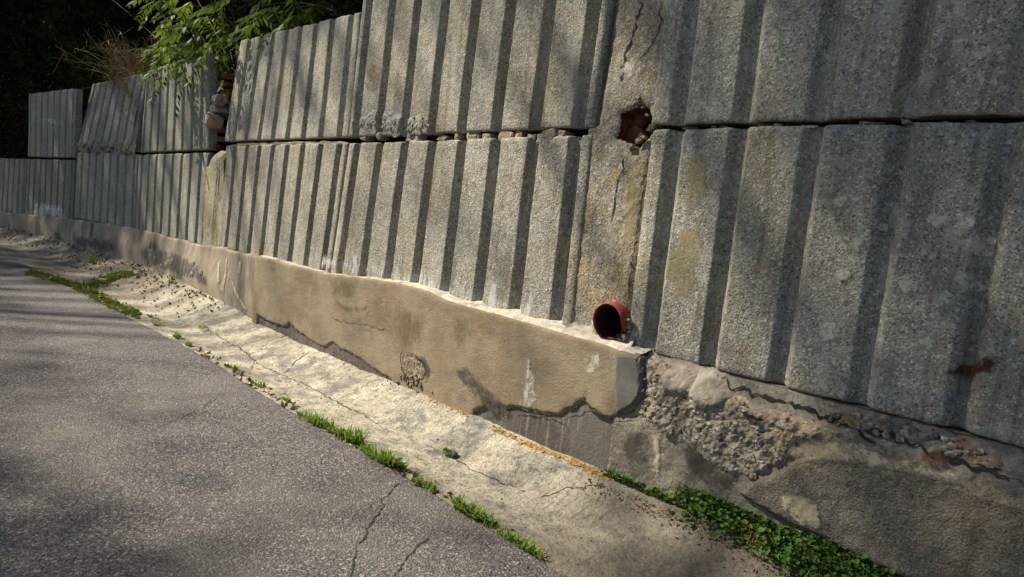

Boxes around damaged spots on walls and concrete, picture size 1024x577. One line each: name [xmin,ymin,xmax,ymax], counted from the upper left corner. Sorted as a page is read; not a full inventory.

spalling [617,96,676,149]
water stain [524,360,535,405]
corrosion [948,358,996,379]
spalling [510,349,1003,480]
crack [717,374,1023,483]
crack [454,458,611,498]
crack [350,481,403,576]